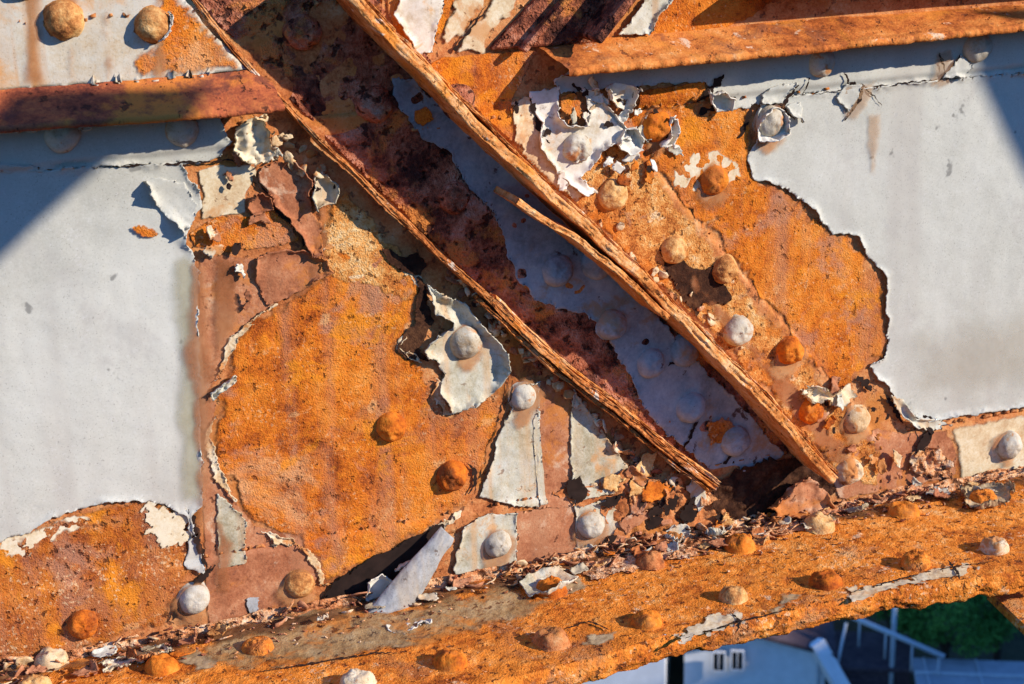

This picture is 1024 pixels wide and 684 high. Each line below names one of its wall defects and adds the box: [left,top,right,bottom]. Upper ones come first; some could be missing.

crack [738,53,975,138]
crack [99,159,305,247]
rust [364,0,886,485]
peeling [382,31,1024,602]
peeling [0,114,546,677]
rust [186,191,721,579]
rust [768,476,972,518]
rust [0,502,340,682]
rust [353,598,378,610]
rust [412,521,627,605]
peeling [0,656,48,684]